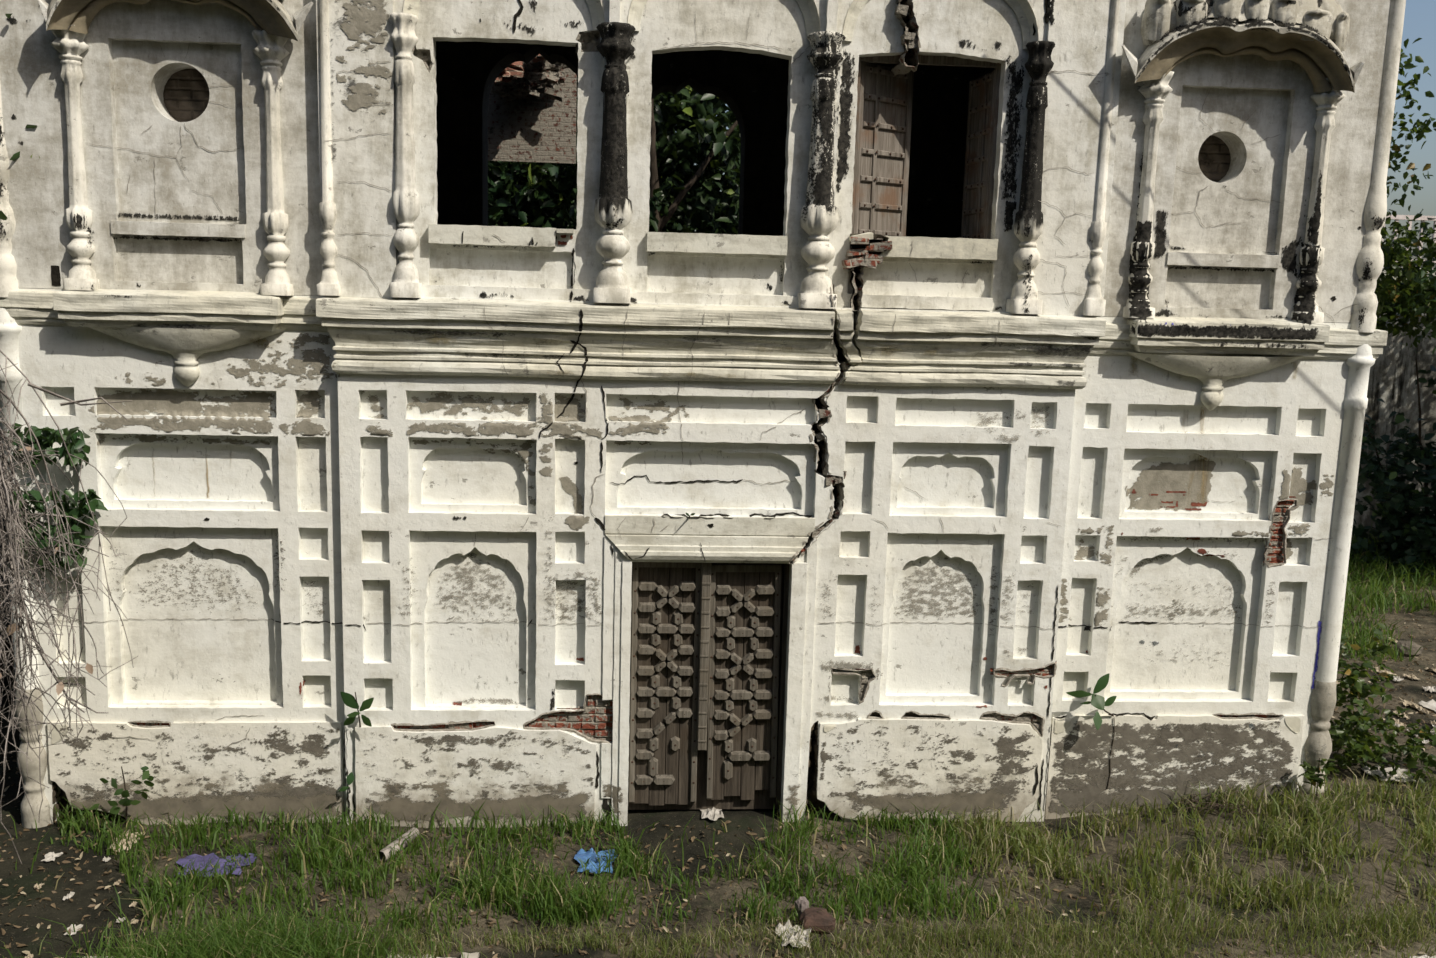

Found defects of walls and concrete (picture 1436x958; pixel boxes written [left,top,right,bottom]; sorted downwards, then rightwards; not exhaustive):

crack [513,0,524,33]
crack [891,0,921,75]
leakage [602,31,636,233]
leakage [812,39,855,213]
leakage [959,40,1045,237]
leakage [1128,155,1322,349]
peeling [88,333,340,445]
crack [462,231,888,564]
flaking render [1059,459,1334,632]
peeling [52,720,340,822]
flaking render [364,689,613,821]
peeling [805,645,1294,816]